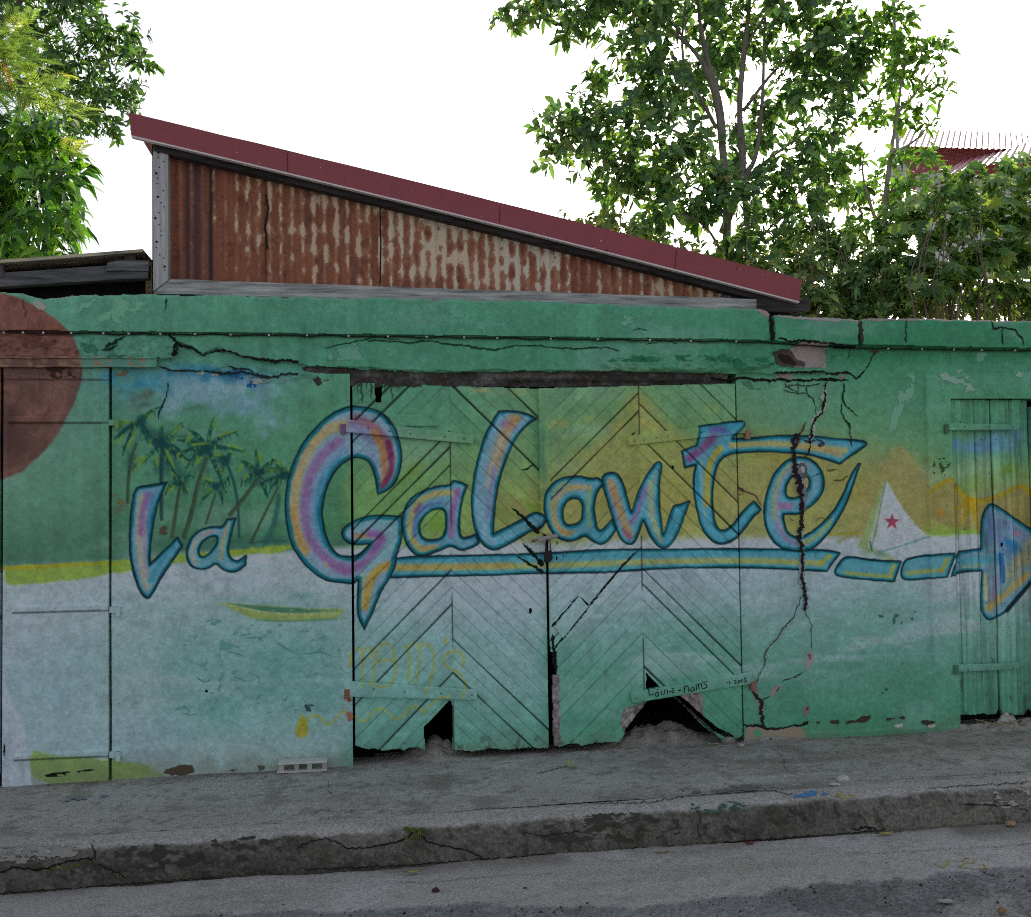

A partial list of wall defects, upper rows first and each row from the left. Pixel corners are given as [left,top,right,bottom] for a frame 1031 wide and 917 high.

crack [327,328,677,351]
crack [991,321,1024,346]
spalling [773,341,829,379]
crack [710,315,877,730]
crack [0,844,224,895]